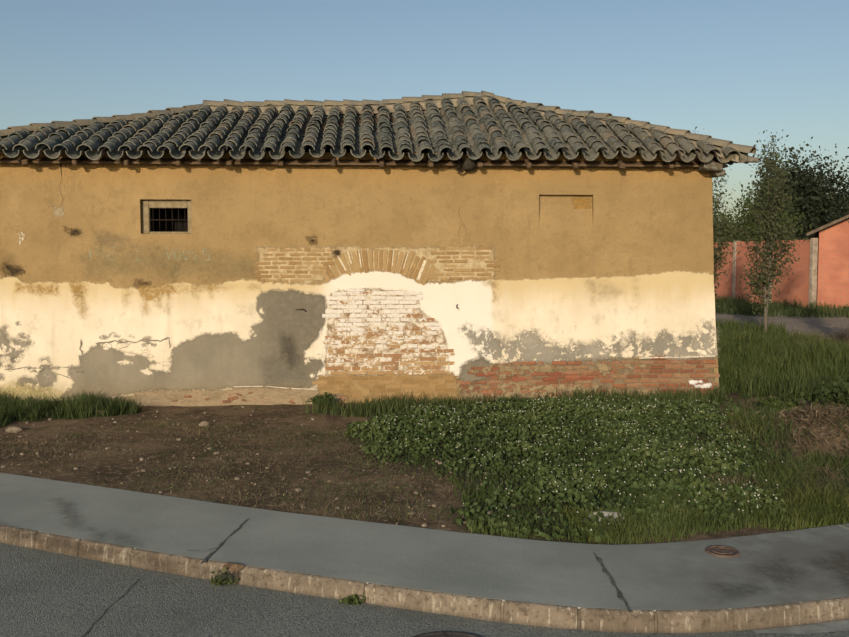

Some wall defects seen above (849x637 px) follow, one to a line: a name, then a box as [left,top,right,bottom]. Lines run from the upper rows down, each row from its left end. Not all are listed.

peeling [0,263,717,407]